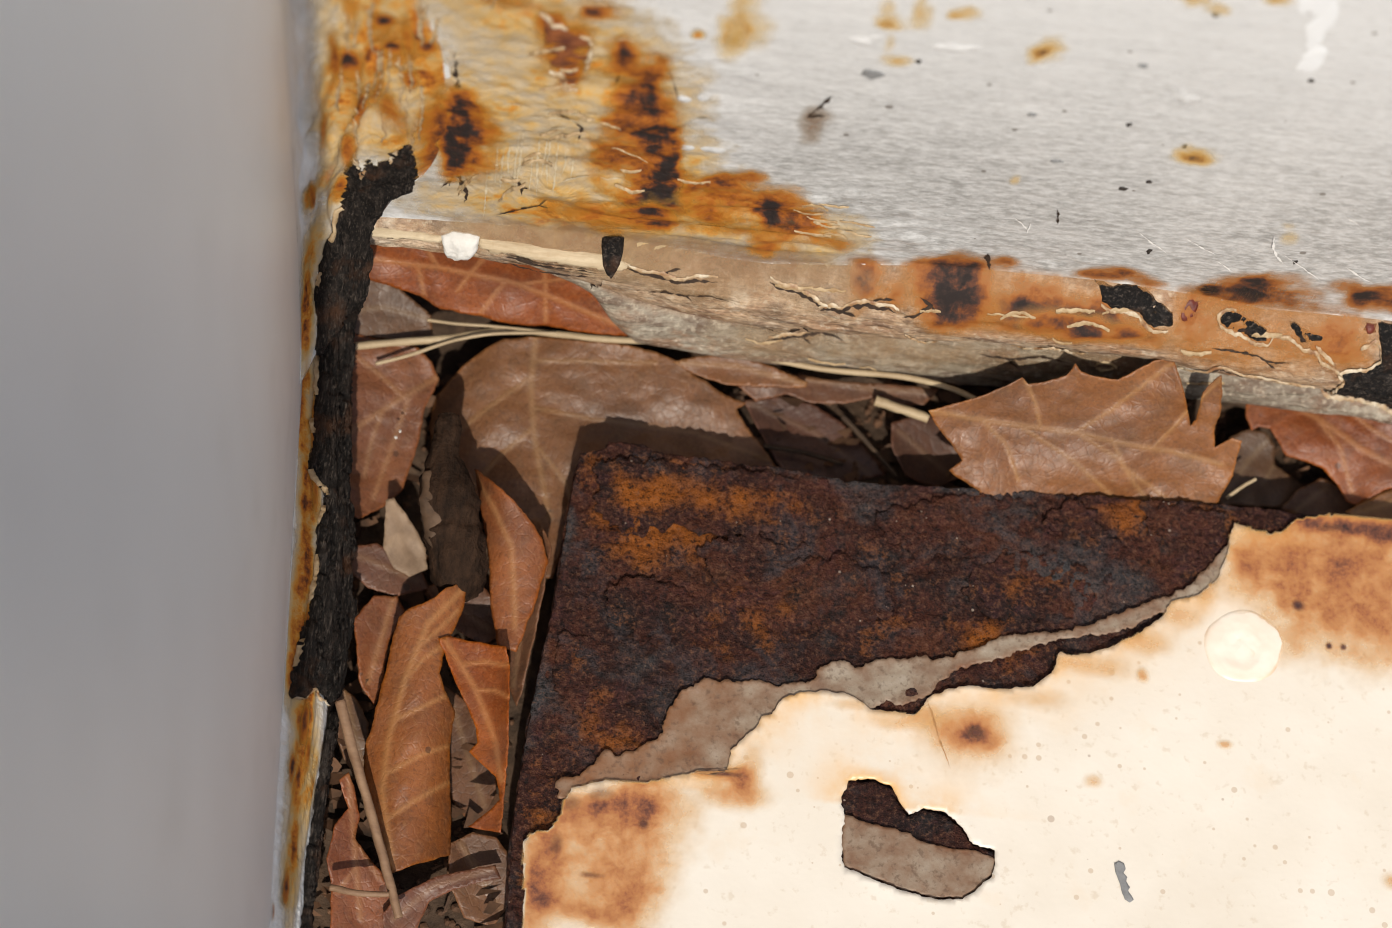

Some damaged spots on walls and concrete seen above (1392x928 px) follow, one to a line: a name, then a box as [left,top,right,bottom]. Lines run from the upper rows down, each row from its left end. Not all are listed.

rust [877,17,900,29]
rust [1030,43,1061,62]
rust [1175,148,1213,165]
crack [590,262,729,304]
crack [762,276,940,344]
rust [848,253,1392,365]
crack [984,345,1088,369]
crack [1176,349,1315,389]
rust [272,0,866,928]
rust [1227,514,1392,665]
spalling [506,442,1318,928]
rust [907,708,1005,755]